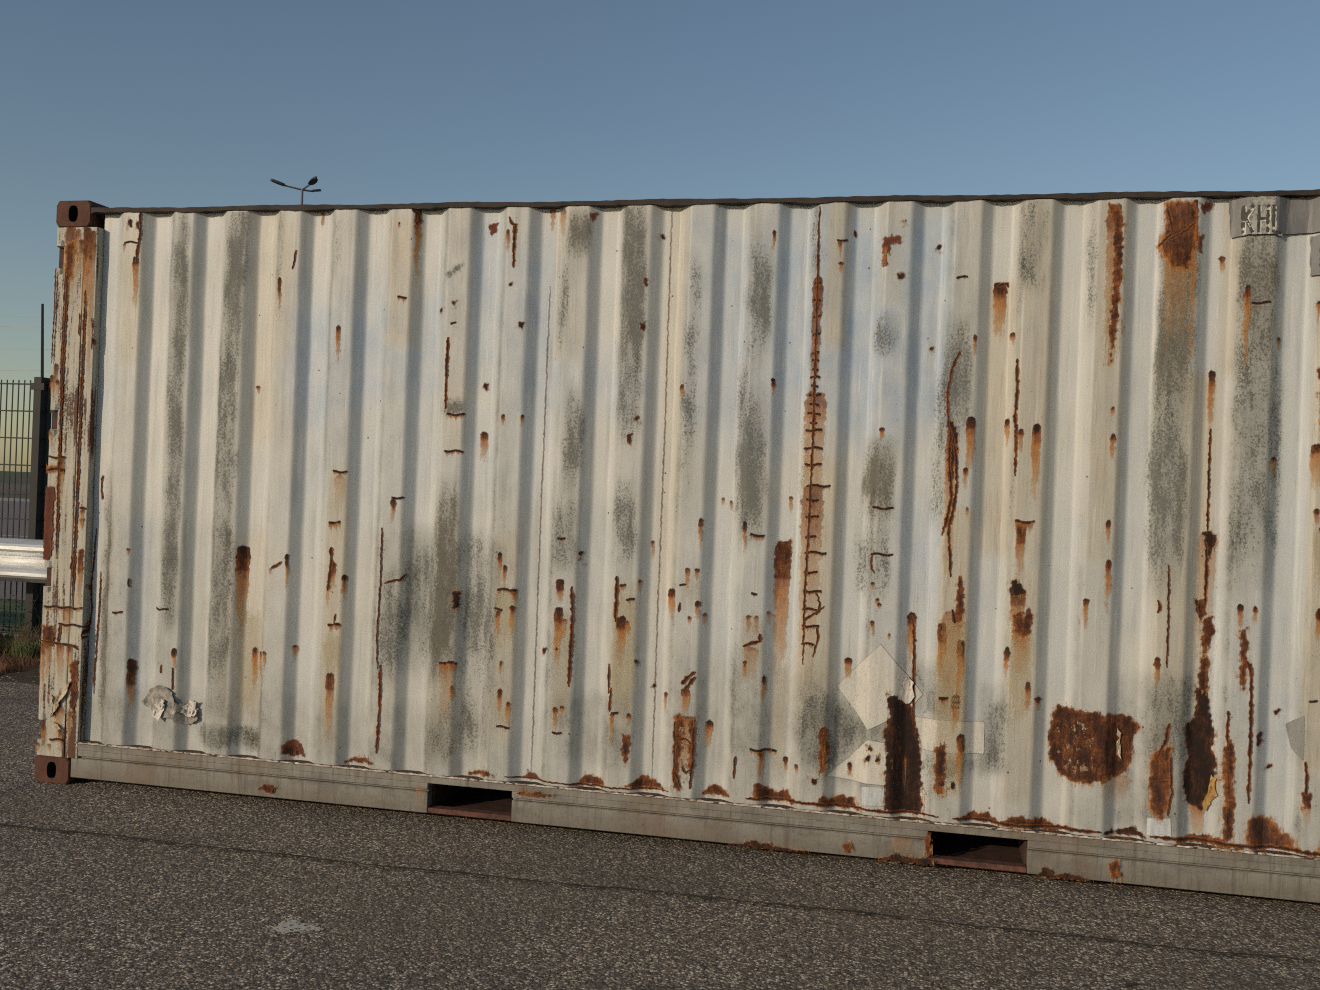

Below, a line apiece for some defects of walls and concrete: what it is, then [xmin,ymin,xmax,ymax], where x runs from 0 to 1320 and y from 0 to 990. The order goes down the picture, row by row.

corrosion [1156,199,1199,284]
corrosion [50,226,95,390]
corrosion [1105,203,1126,365]
corrosion [43,486,55,561]
corrosion [70,549,84,588]
corrosion [235,545,250,608]
corrosion [466,370,1320,857]
corrosion [69,660,78,715]
corrosion [35,725,63,748]
corrosion [878,834,934,866]
corrosion [1036,867,1088,881]
corrosion [1108,859,1121,882]